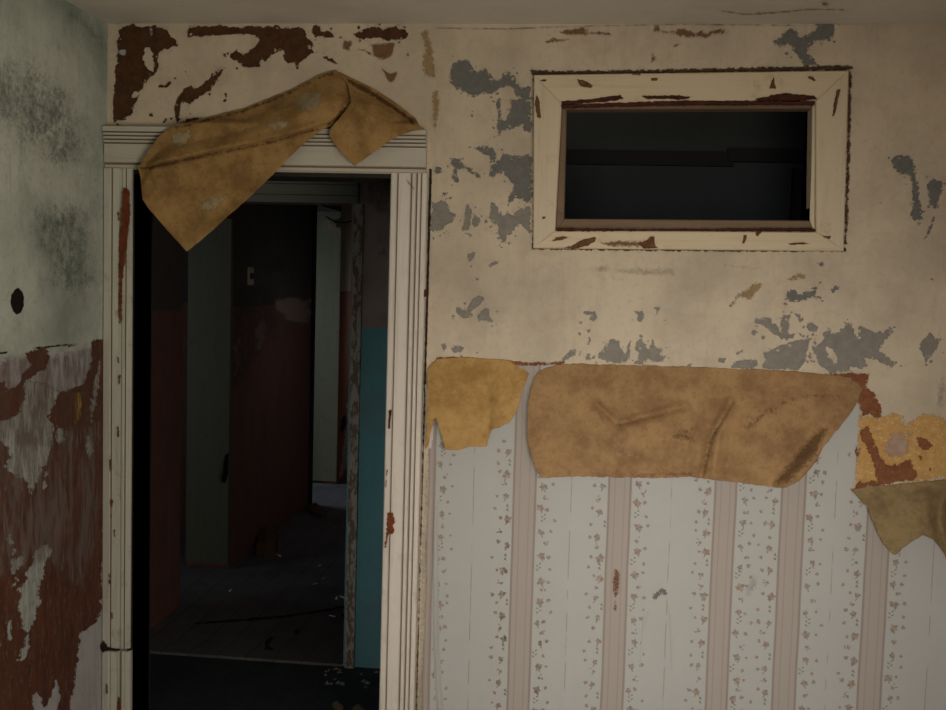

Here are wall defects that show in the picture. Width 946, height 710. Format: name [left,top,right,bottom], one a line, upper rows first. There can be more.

peeling [113,24,408,125]
peeling [561,77,817,109]
peeling [773,24,840,81]
peeling [430,55,545,248]
peeling [888,154,946,239]
peeling [552,228,831,249]
peeling [452,292,499,327]
peeling [431,343,478,364]
peeling [510,311,669,366]
peeling [0,339,115,710]